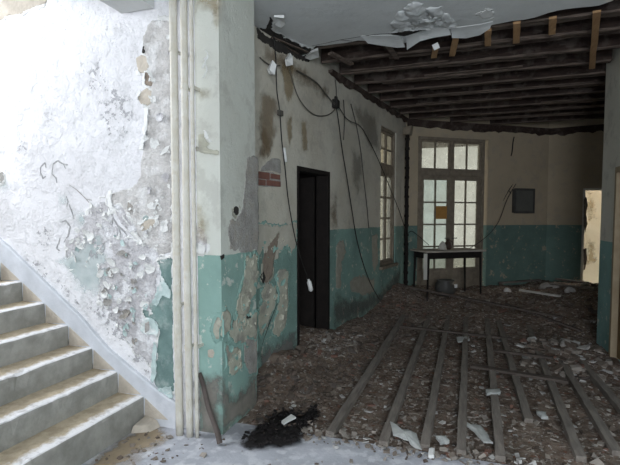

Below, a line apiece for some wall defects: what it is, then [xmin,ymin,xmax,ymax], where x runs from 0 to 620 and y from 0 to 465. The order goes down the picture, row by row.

spalling [256,15,319,66]
peeling [360,8,495,50]
water stain [261,97,275,154]
peeling [64,15,175,399]
spalling [208,155,297,377]